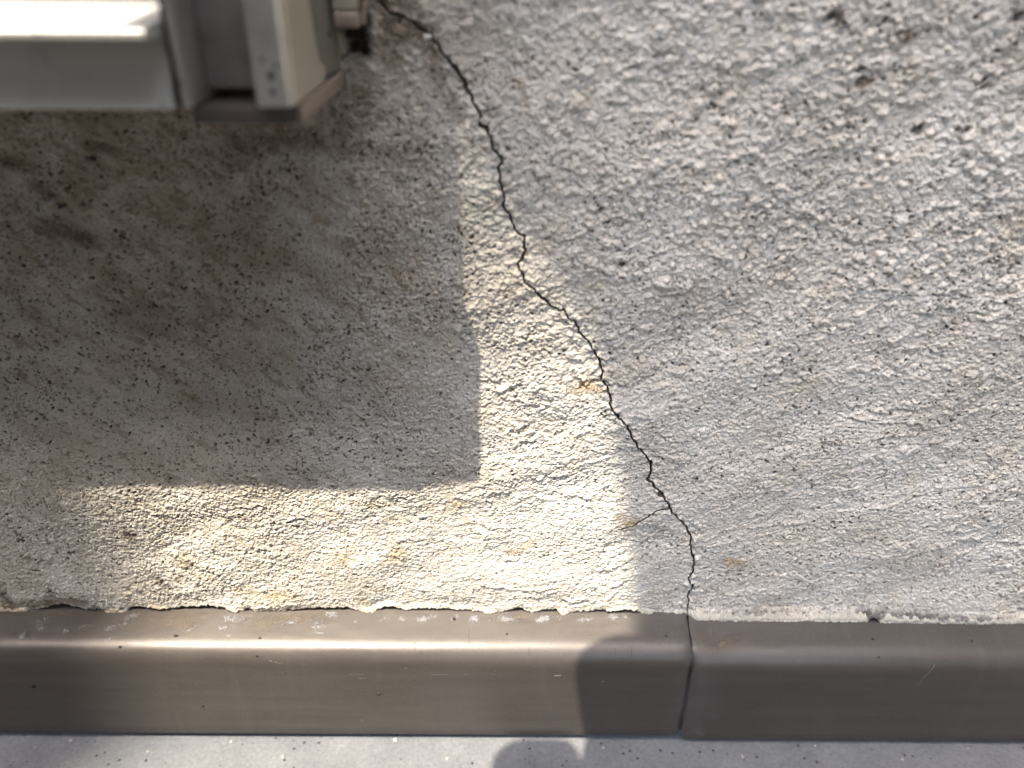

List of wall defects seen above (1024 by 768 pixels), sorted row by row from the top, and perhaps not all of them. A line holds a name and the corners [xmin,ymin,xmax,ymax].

crack [378,0,700,730]